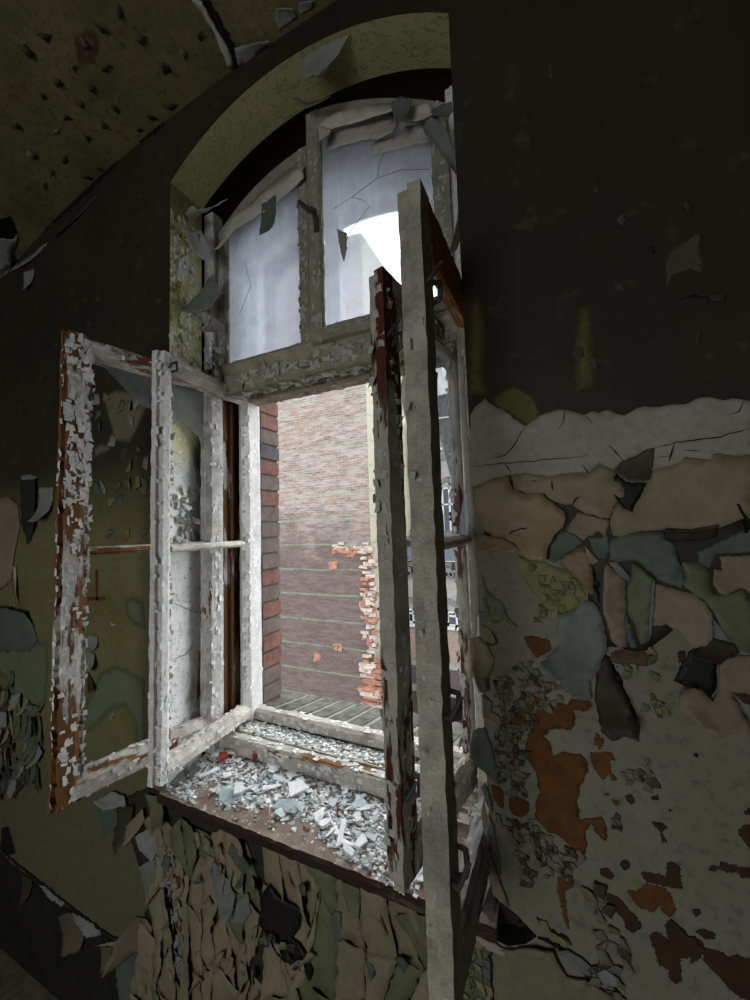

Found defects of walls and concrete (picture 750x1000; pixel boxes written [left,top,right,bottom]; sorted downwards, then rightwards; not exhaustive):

peeling [169,163,304,366]
crack [473,427,589,503]
crack [656,401,750,460]
peeling [0,474,54,803]
flaking render [463,397,750,1000]
peeling [93,787,429,1000]